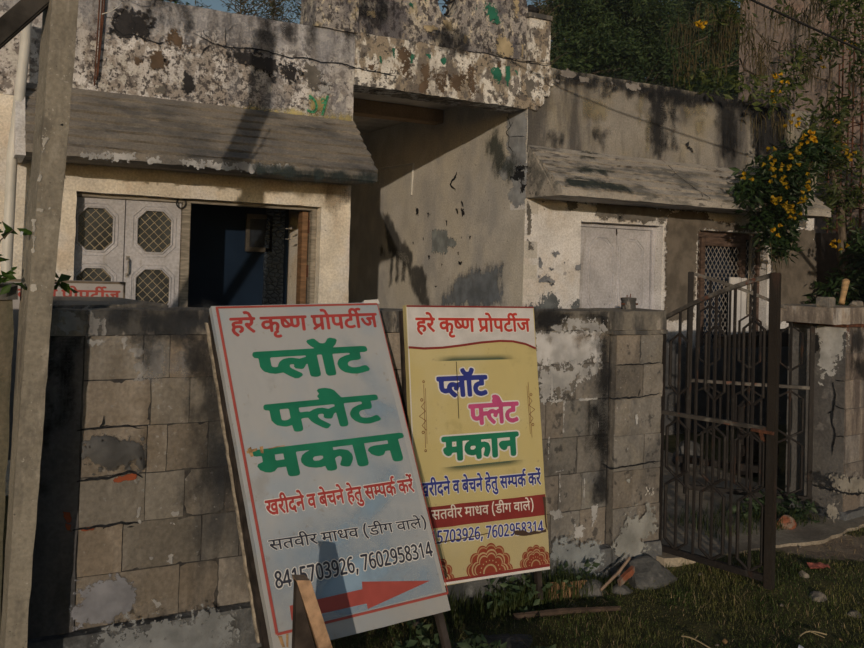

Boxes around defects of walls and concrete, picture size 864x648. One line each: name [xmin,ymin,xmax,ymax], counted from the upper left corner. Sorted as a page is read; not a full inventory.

peeling [106,5,192,70]
peeling [226,45,330,92]
leakage [553,71,791,158]
leakage [486,131,517,180]
leakage [380,215,429,305]
leakage [442,263,504,306]
peeling [535,330,602,405]
crack [77,417,141,431]
crack [828,380,844,454]
crack [76,470,143,482]
crack [73,521,139,531]
peeling [68,573,246,648]